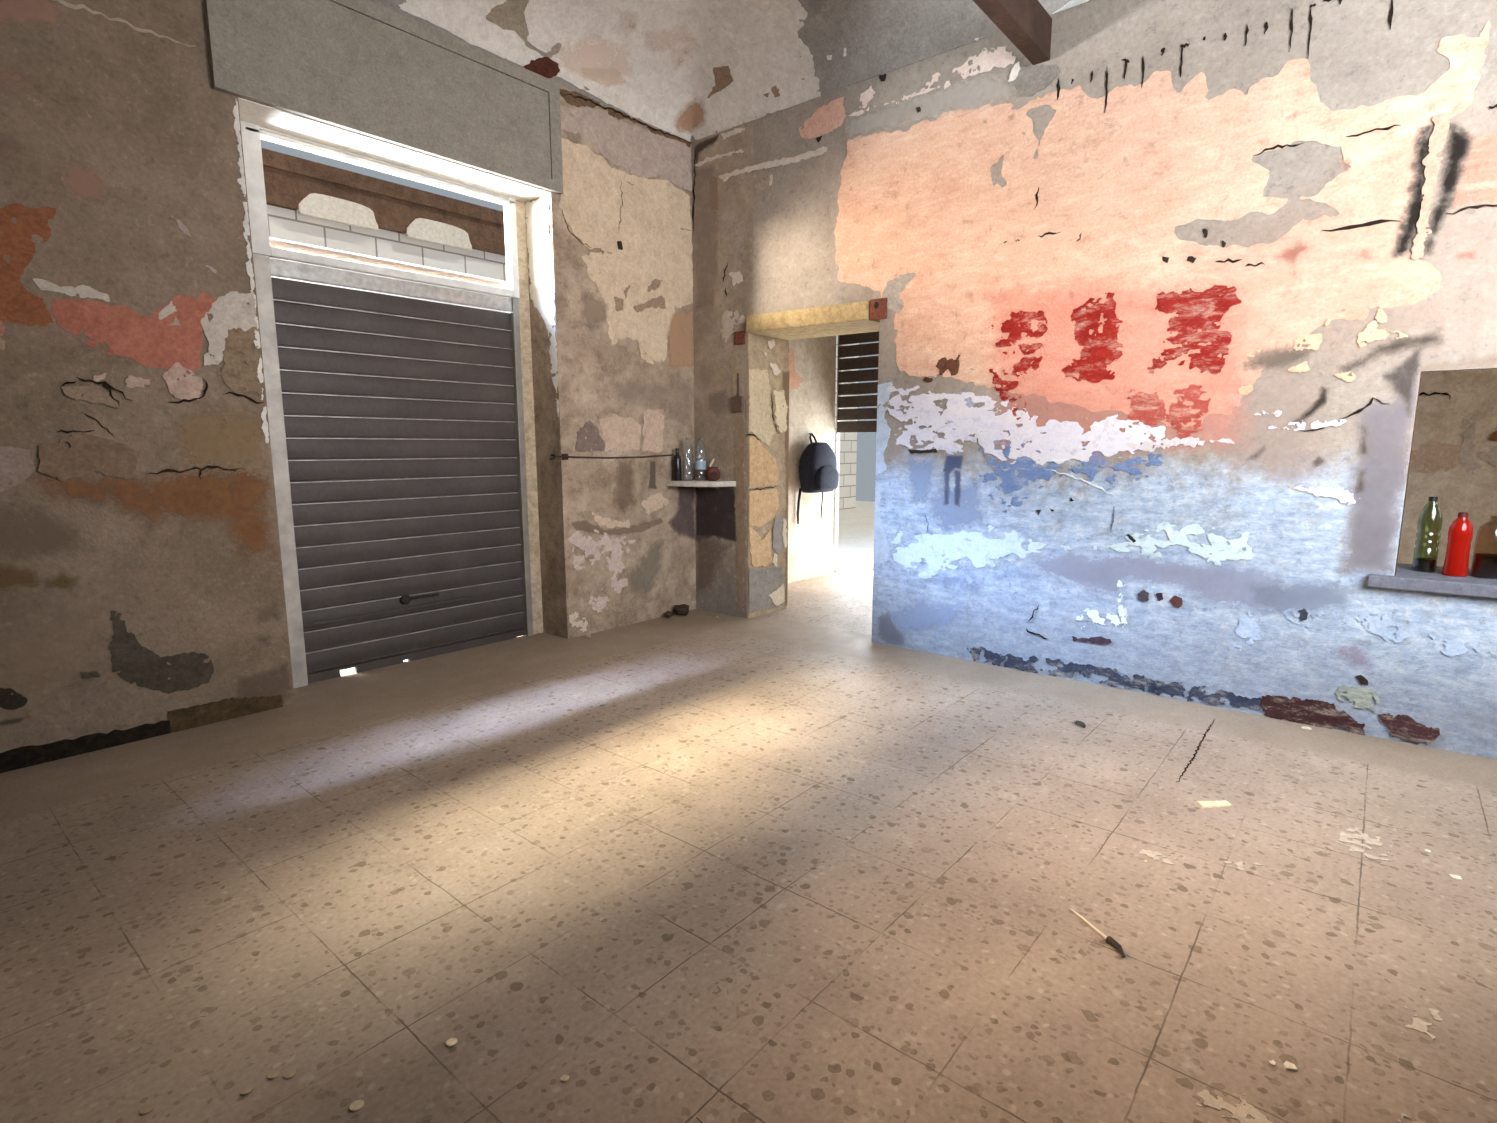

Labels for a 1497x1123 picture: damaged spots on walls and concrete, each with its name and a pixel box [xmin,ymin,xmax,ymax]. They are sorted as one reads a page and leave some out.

damp [1424,123,1471,254]
peeling [0,99,269,443]
peeling [399,0,1497,611]
peeling [0,446,36,492]
peeling [79,610,214,694]
peeling [969,646,1038,673]
flaking render [1071,636,1112,645]
peeling [1233,609,1262,651]
peeling [1281,607,1328,628]
peeling [1356,612,1480,657]
peeling [1187,686,1262,710]